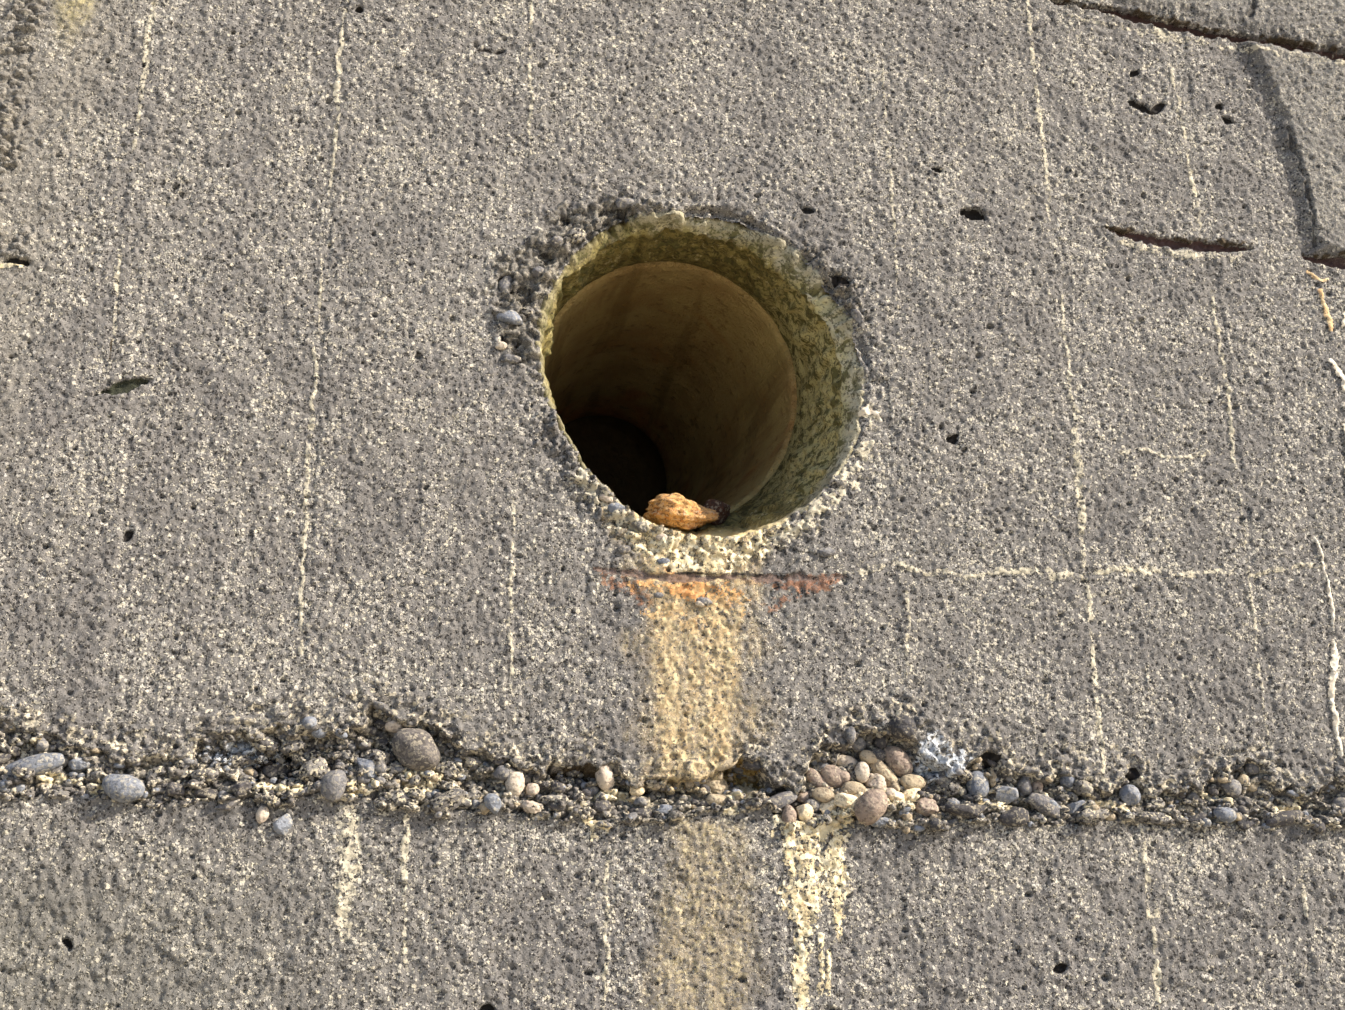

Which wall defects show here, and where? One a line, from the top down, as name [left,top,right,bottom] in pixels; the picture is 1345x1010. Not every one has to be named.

crack [1248,0,1256,17]
corrosion [625,514,788,790]
water stain [771,808,855,1010]